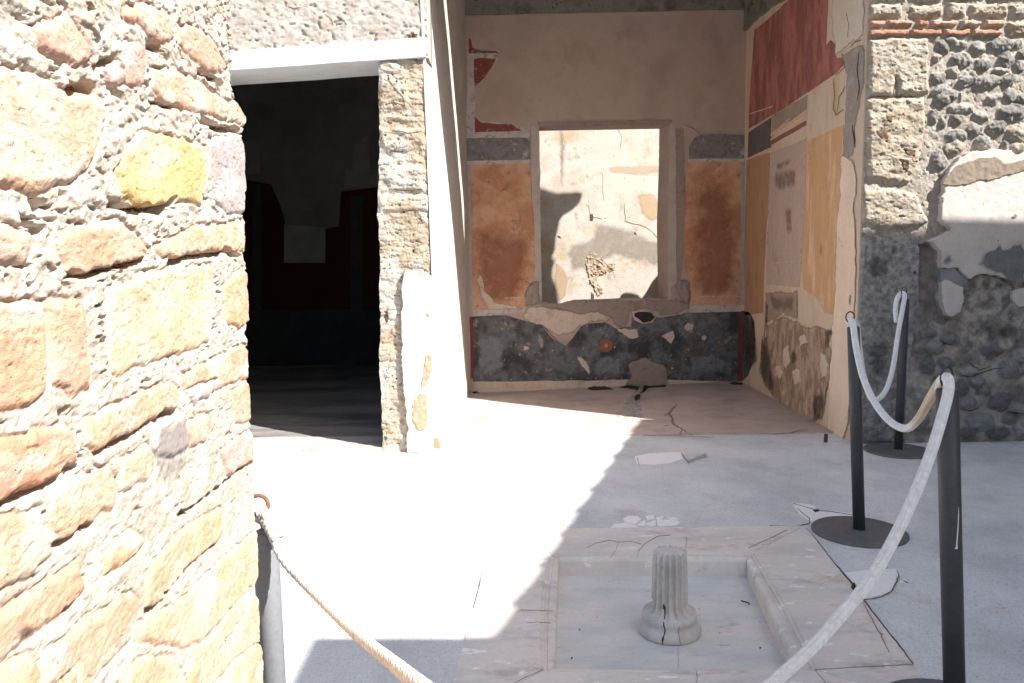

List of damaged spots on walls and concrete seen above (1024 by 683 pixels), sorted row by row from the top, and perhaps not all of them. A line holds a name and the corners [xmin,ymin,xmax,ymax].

flaking render [832,0,865,158]
flaking render [942,156,1024,186]
flaking render [477,227,691,328]
flaking render [937,268,969,287]
flaking render [662,323,707,344]
flaking render [760,291,832,421]
crack [615,390,706,463]
crack [589,535,687,558]
crack [662,604,698,678]